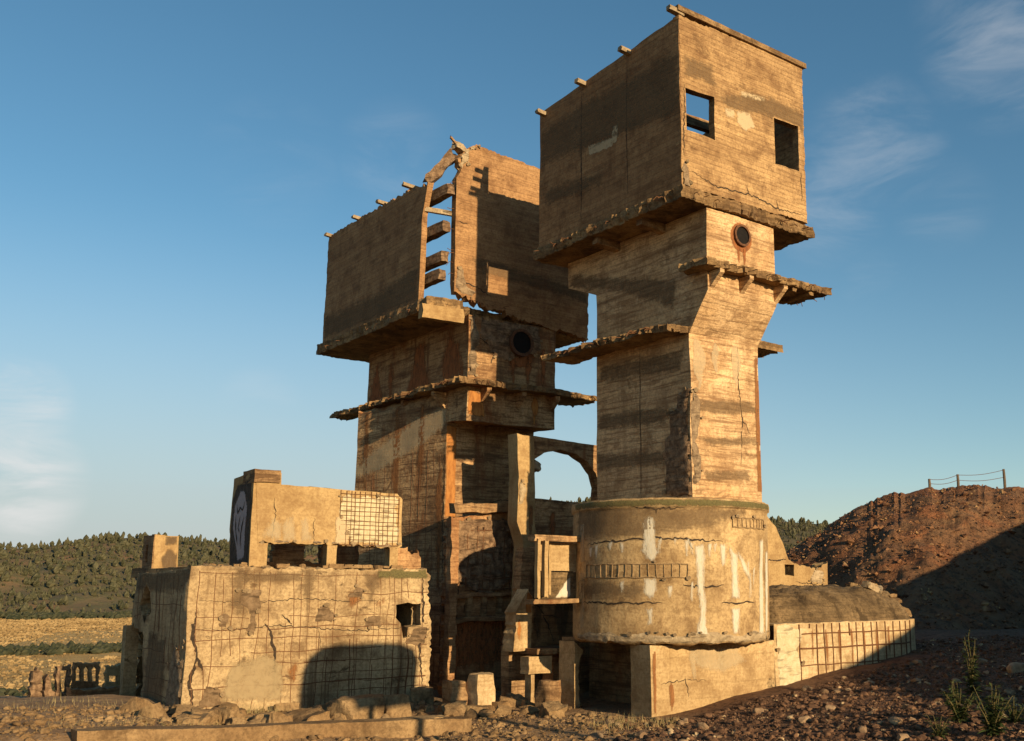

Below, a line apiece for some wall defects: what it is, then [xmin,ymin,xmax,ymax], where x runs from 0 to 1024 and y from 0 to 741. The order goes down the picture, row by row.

crack [683,86,804,216]
corrosion [731,223,752,265]
spalling [453,266,475,298]
crack [737,347,750,462]
spalling [662,387,704,498]
crack [187,436,461,705]
water stain [579,506,768,634]
spalling [235,588,261,636]
spalling [315,603,338,622]
water stain [555,571,656,641]
corrosion [812,626,891,667]
corrosion [653,652,674,713]